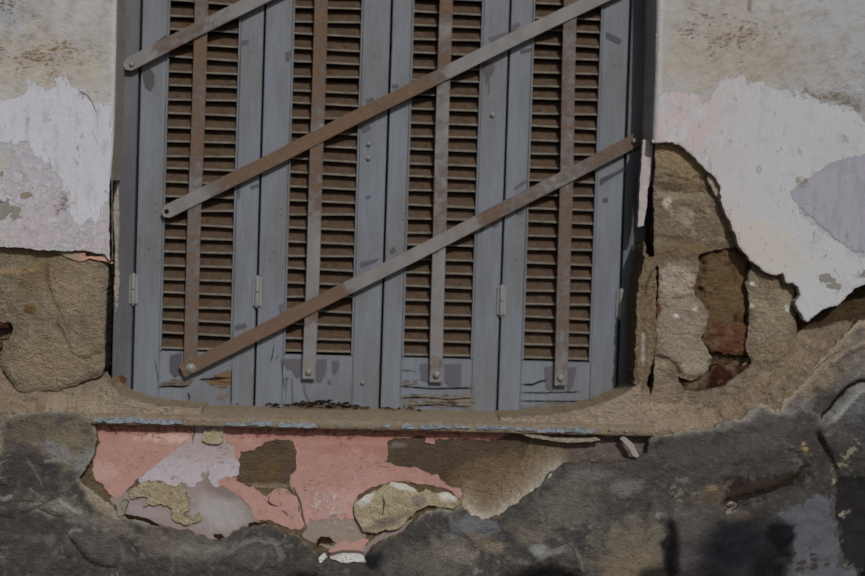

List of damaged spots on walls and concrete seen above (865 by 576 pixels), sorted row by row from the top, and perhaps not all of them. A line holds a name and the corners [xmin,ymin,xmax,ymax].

flaking render [0,74,115,393]
flaking render [625,73,865,409]
peeling [93,416,318,540]
flaking render [302,423,600,563]
crack [726,471,803,503]